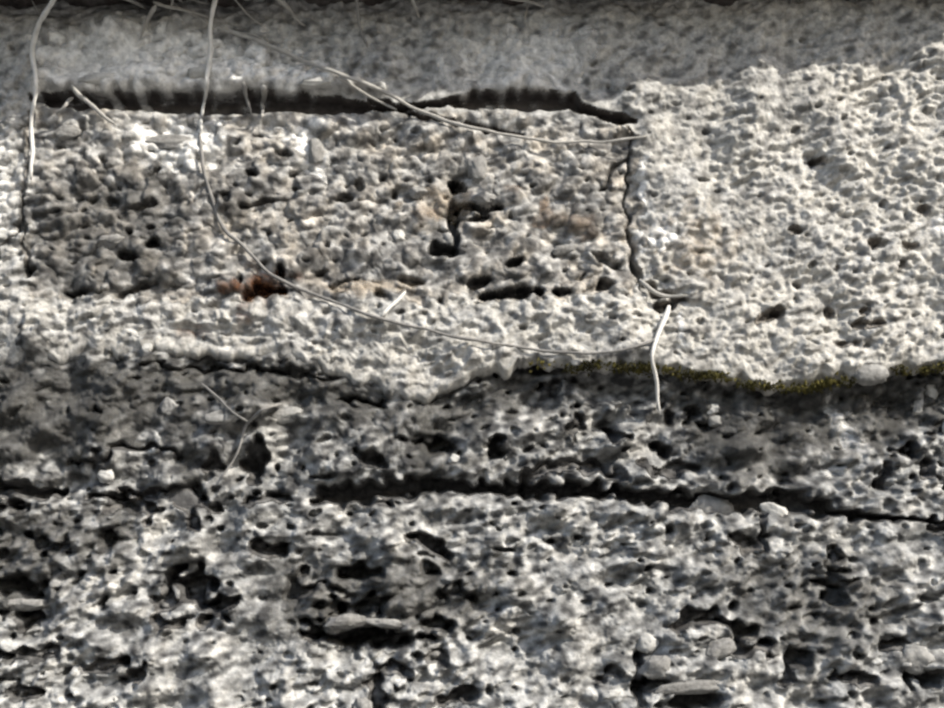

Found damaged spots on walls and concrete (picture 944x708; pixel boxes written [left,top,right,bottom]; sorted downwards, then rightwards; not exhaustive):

spalling [0,11,647,311]
crack [0,87,689,309]
spalling [653,301,674,313]
crack [0,440,178,502]
spalling [167,449,227,531]
spalling [240,433,291,508]
spalling [488,434,505,458]
crack [309,457,944,557]
spalling [635,441,700,480]
water stain [660,373,944,495]
spalling [871,443,942,490]
spalling [404,532,478,602]